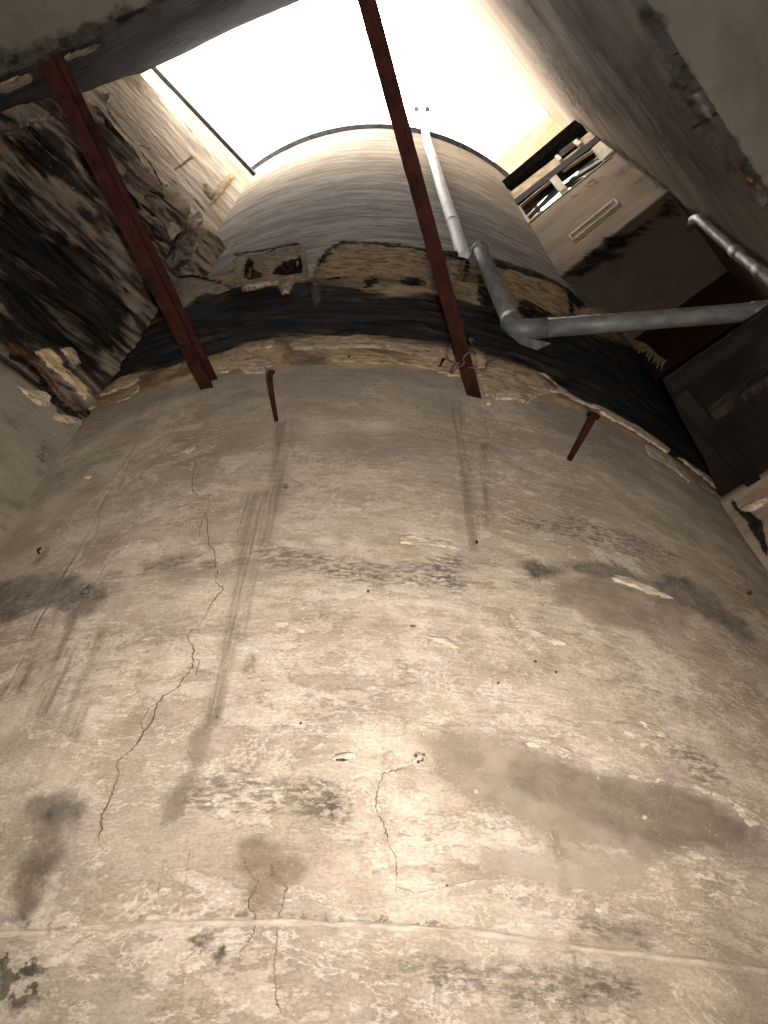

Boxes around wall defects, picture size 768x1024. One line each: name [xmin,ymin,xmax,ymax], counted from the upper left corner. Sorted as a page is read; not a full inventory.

flaking render [173,243,434,307]
flaking render [16,347,140,426]
flaking render [217,335,461,378]
flaking render [475,353,721,499]
crack [98,458,236,849]
damp [17,798,80,912]
damp [168,777,192,817]
crack [375,765,412,882]
crack [238,852,288,1019]